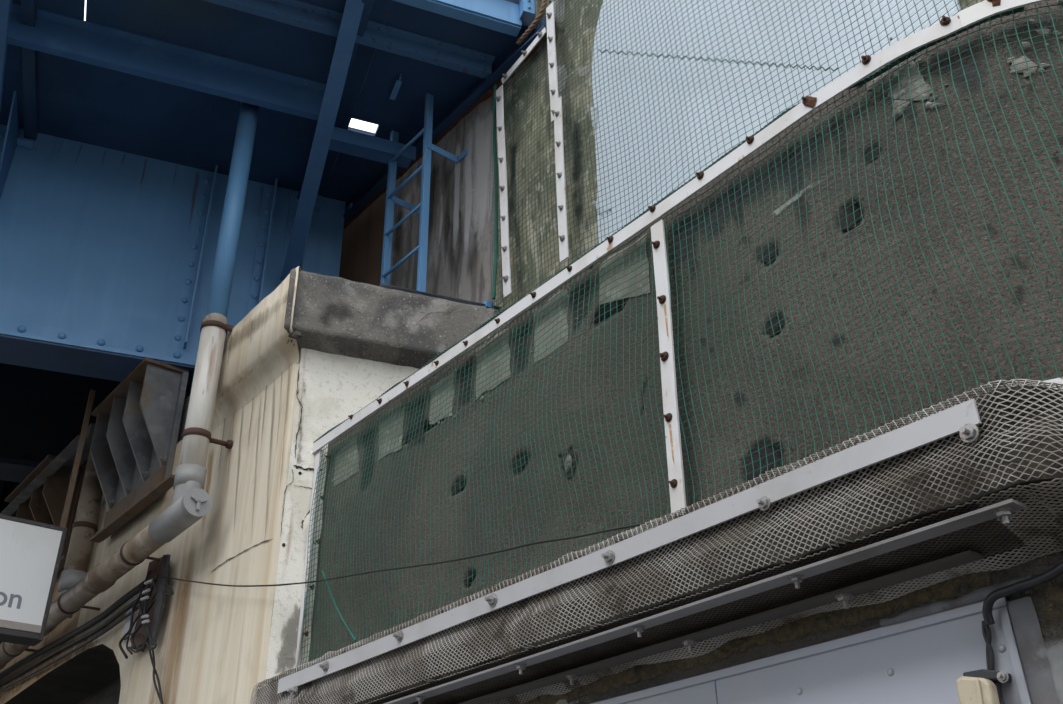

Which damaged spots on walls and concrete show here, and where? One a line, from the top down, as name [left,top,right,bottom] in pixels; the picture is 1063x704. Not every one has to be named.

spalling [1007,19,1062,78]
spalling [860,53,949,123]
leakage [573,124,582,181]
leakage [429,112,494,269]
crack [211,370,322,572]